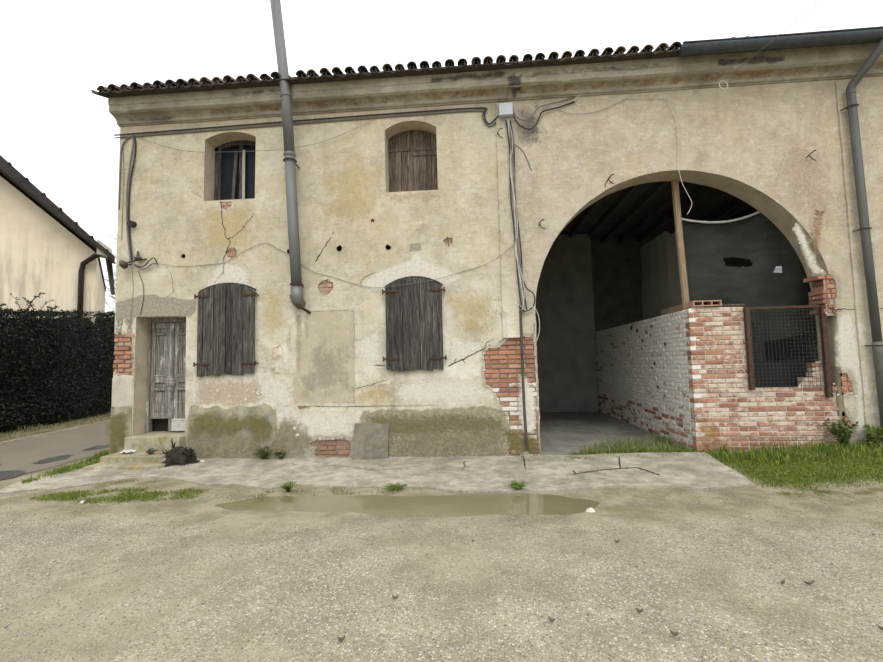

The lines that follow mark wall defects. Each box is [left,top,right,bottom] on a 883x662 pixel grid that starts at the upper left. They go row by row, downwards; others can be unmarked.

crack [214,201,254,283]
flaking render [318,280,333,295]
flaking render [113,319,138,381]
flaking render [188,374,354,458]
flaking render [395,334,541,456]